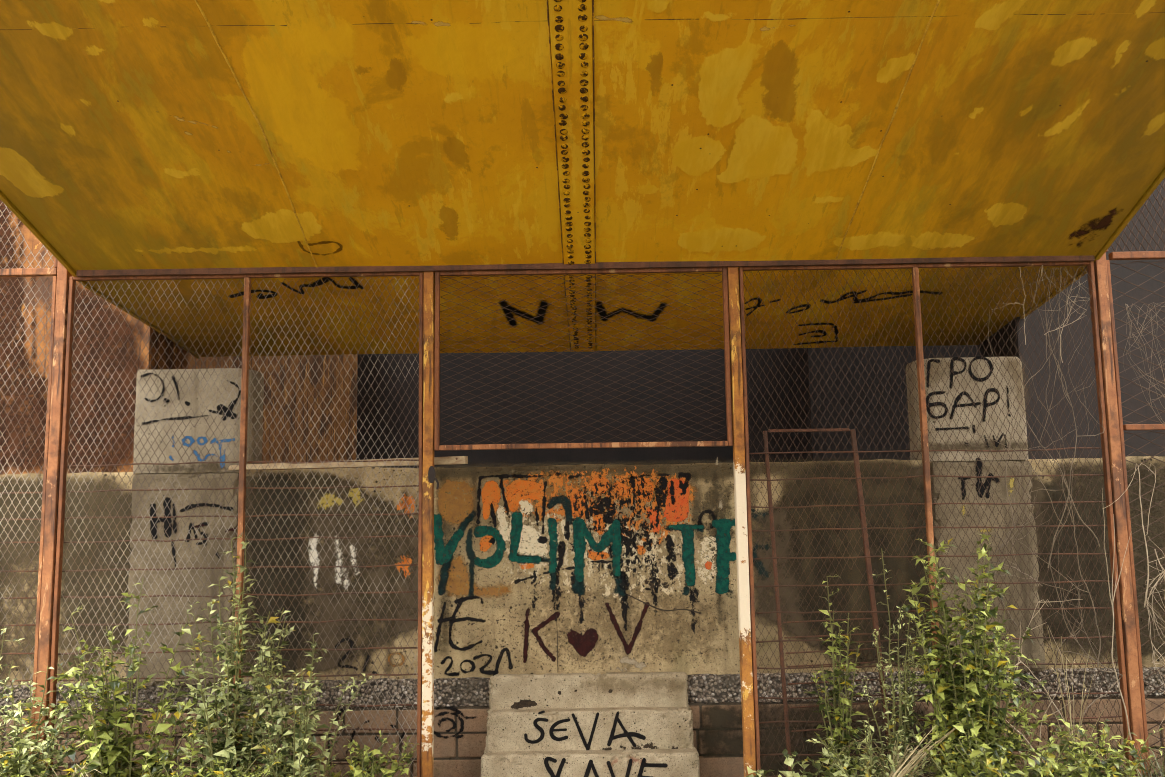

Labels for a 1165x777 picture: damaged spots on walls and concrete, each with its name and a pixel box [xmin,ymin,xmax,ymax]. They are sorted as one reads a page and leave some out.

rust [1070,208,1117,246]
rust [0,200,47,472]
peeling [435,466,735,672]